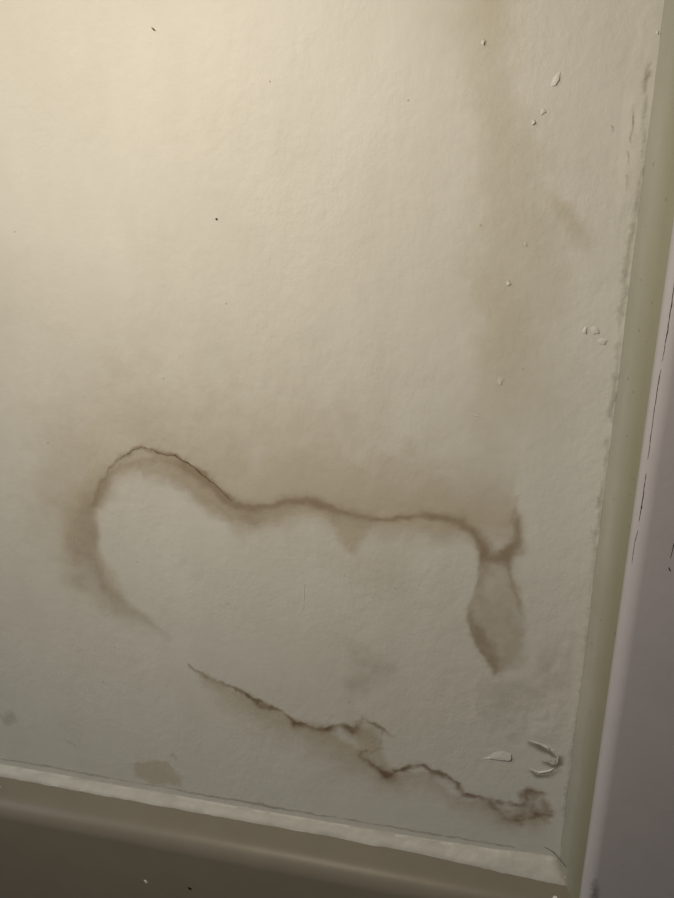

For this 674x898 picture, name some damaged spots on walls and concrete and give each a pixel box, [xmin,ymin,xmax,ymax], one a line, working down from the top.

water stain [144,450,520,571]
water stain [233,687,501,809]
peeling [530,740,561,777]